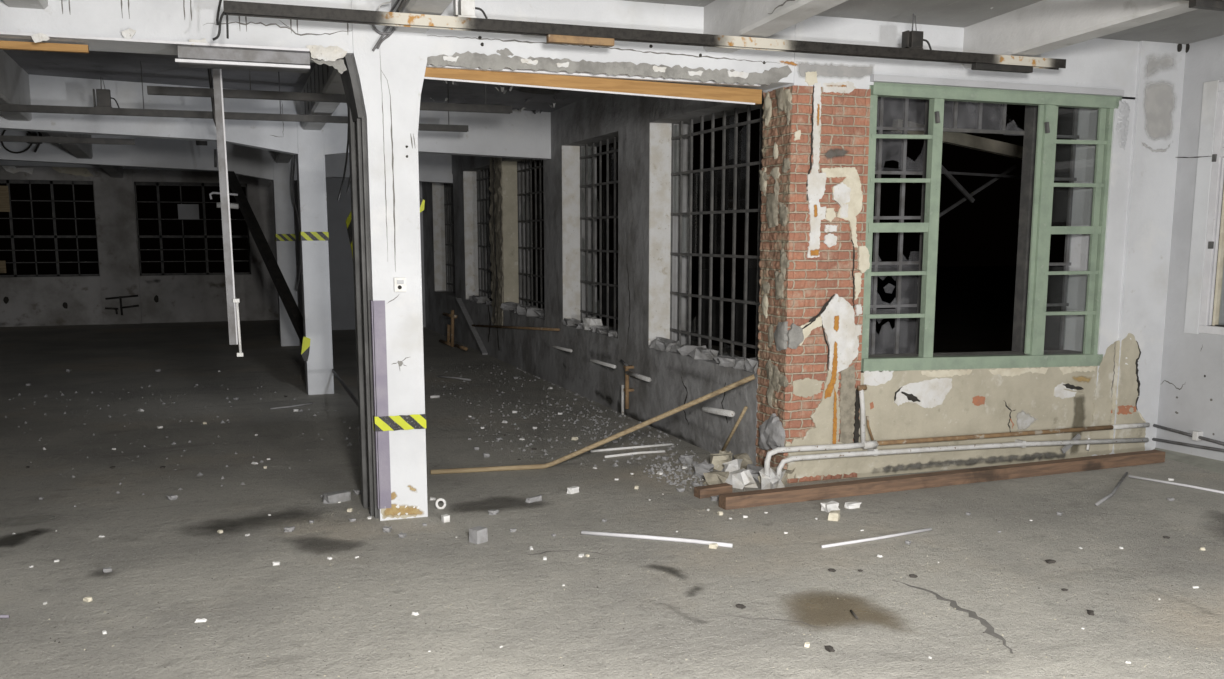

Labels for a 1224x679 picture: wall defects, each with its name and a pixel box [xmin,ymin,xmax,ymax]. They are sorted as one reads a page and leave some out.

spalling [306,45,347,74]
spalling [427,48,792,101]
peeling [495,85,559,114]
spalling [972,396,985,406]
spalling [1073,333,1146,455]
peeling [381,486,422,519]
leakage [794,595,891,625]
crack [892,580,1013,654]